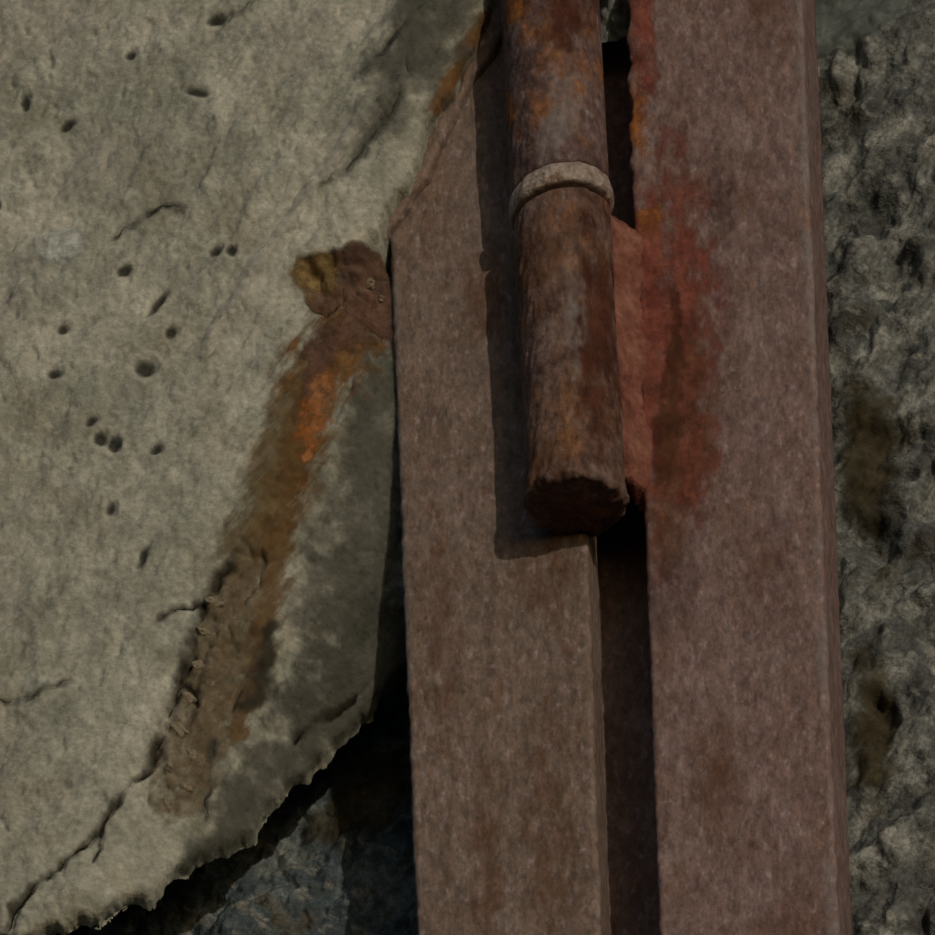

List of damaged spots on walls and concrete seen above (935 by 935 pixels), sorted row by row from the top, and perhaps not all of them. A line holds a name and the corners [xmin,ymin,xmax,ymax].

rust [627,0,659,155]
rust [573,245,621,460]
rust [632,172,722,546]
crack [0,679,66,704]
crack [157,562,234,716]
rust [185,304,385,793]
crack [7,737,164,930]
crack [204,792,212,817]